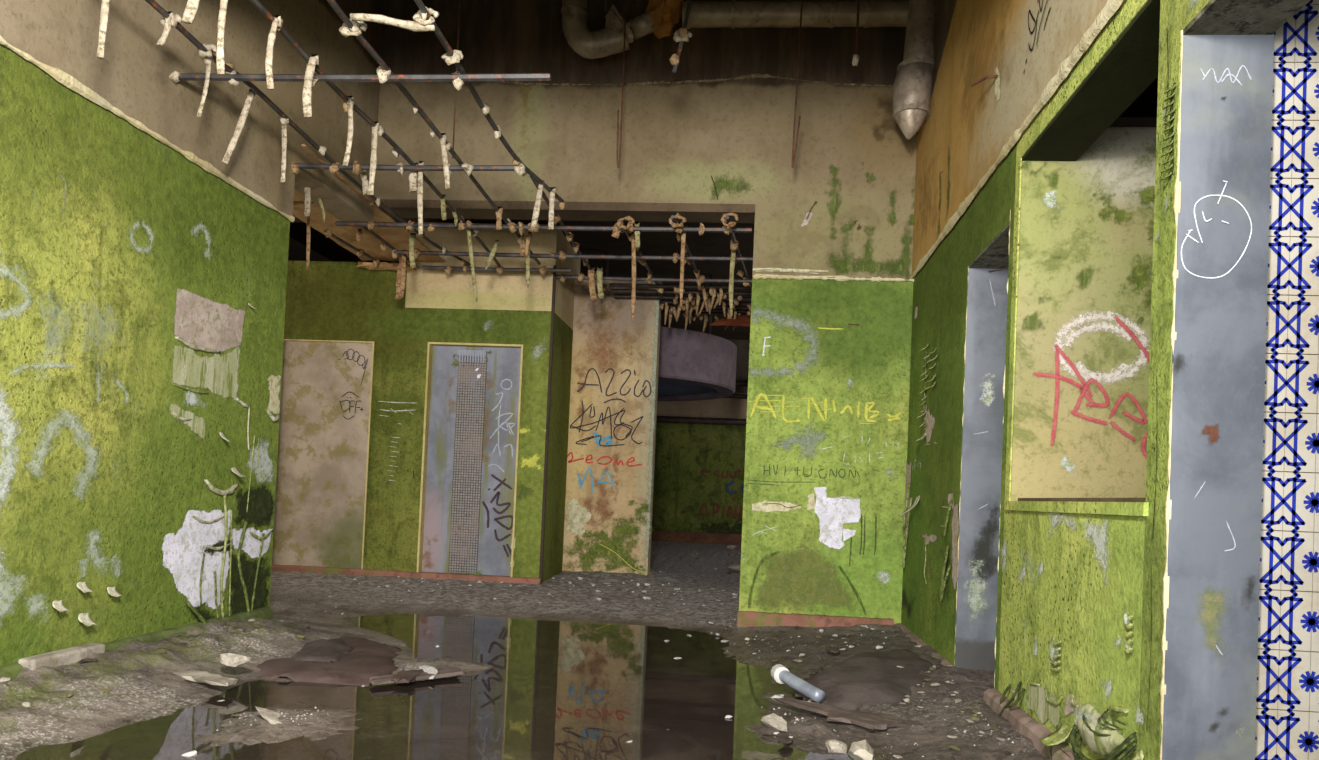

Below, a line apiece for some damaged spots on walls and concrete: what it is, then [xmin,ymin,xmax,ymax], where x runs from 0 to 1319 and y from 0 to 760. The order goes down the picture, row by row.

water stain [831,189,914,275]
peeling [266,374,281,422]
peeling [162,288,274,624]
peeling [751,487,876,564]